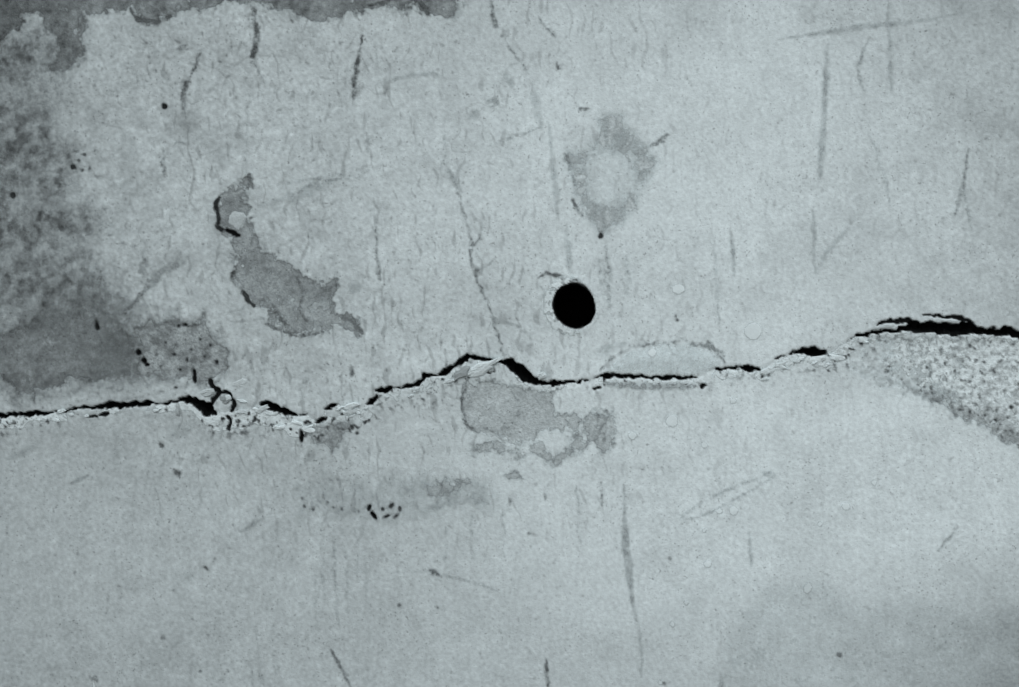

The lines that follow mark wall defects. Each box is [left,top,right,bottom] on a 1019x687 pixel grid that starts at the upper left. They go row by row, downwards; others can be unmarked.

water stain [0,39,70,85]
flaking render [0,0,458,71]
water stain [0,102,104,322]
peeling [213,174,364,338]
crack [0,237,1019,440]
spalling [879,334,1019,446]